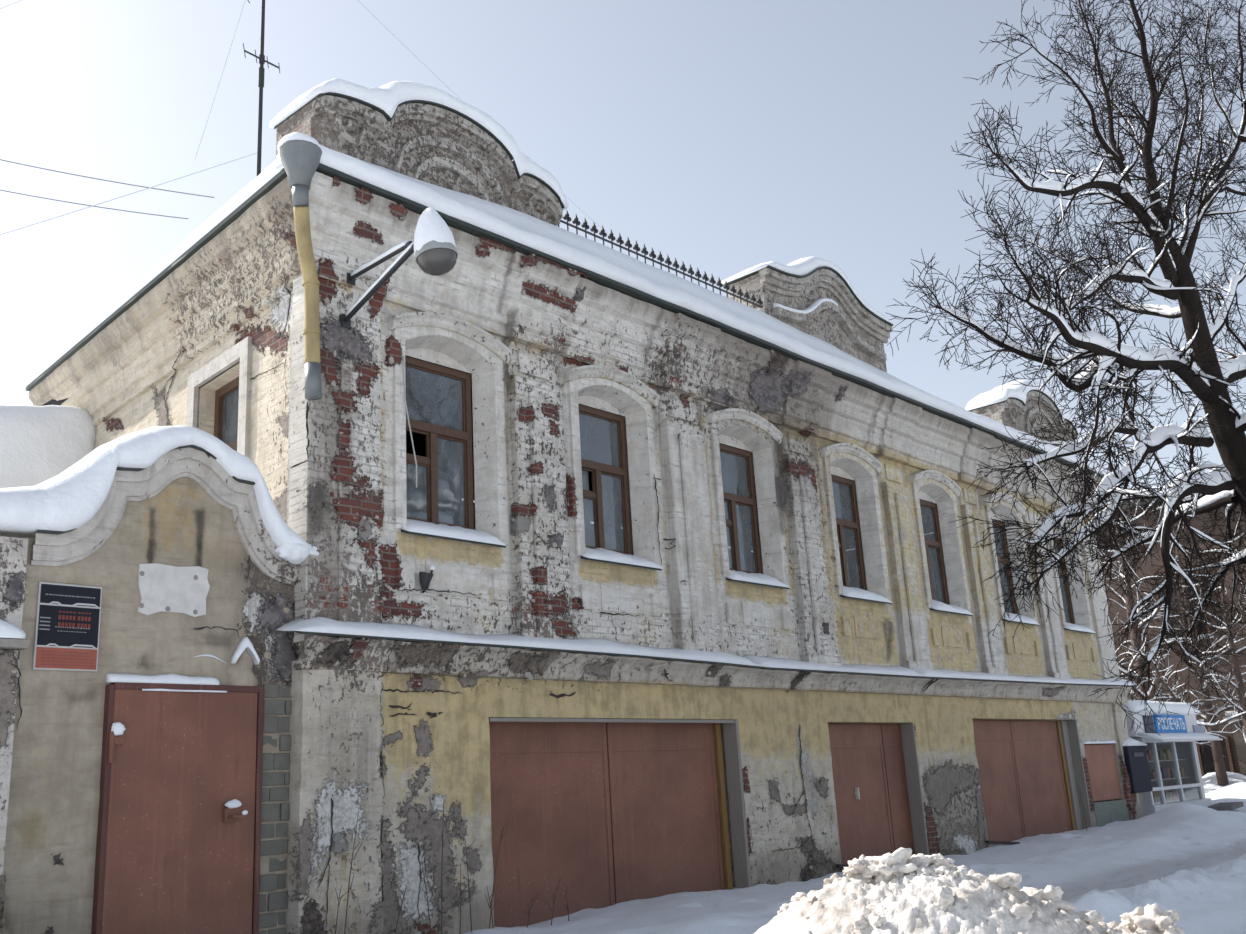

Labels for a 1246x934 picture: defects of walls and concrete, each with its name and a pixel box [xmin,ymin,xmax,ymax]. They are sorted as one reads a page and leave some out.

flaking render [475,236,587,313]
peeling [315,256,427,622]
flaking render [511,460,578,519]
peeling [547,533,564,550]
peeling [2,571,30,610]
spalling [507,565,584,680]
peeling [0,649,18,749]
peeling [286,717,482,934]
peeling [921,759,987,856]